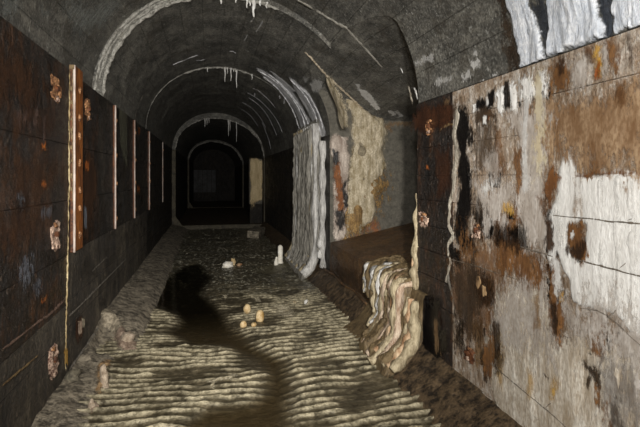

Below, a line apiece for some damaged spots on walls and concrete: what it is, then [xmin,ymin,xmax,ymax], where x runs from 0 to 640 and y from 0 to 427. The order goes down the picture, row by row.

efflorescence [93,0,192,96]
efflorescence [153,52,393,241]
rust [411,103,455,133]
damp [423,0,640,427]
rust [496,57,640,345]
rust [585,37,621,79]